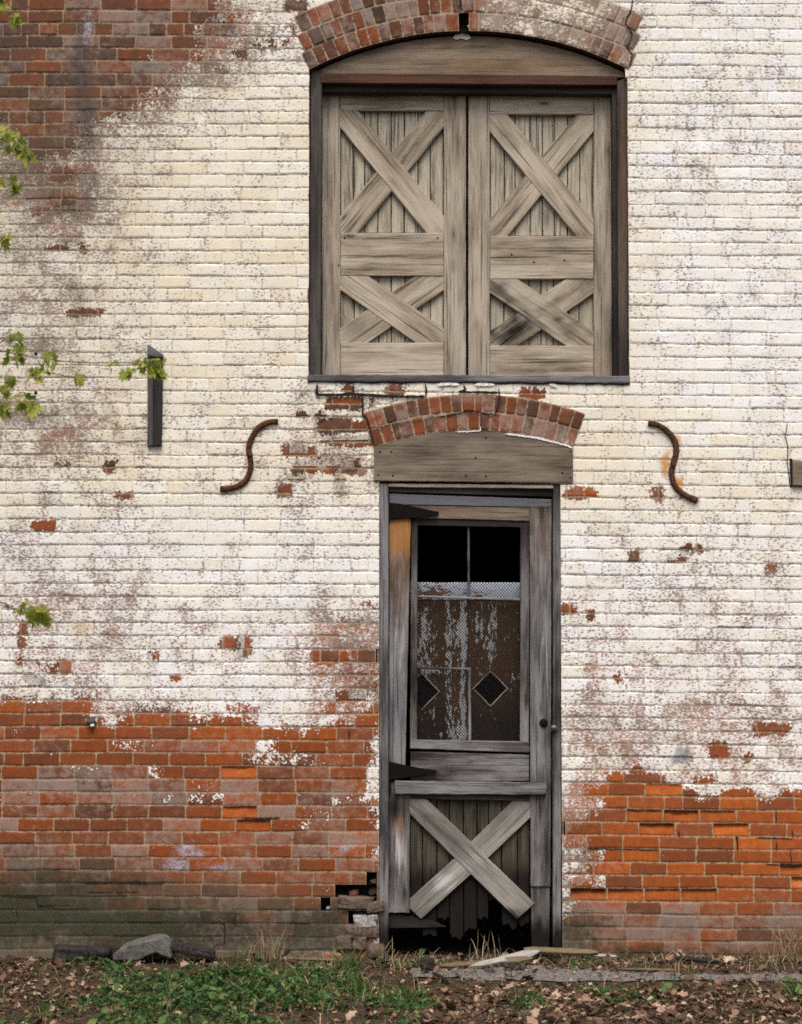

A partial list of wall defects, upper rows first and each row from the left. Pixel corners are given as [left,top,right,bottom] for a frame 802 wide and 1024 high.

peeling [0,0,310,216]
peeling [41,241,91,255]
peeling [65,307,105,319]
peeling [518,386,546,401]
peeling [275,383,407,500]
peeling [102,457,118,475]
peeling [113,489,136,501]
peeling [562,484,599,501]
peeling [28,516,61,535]
peeling [0,619,380,959]
peeling [562,719,802,960]